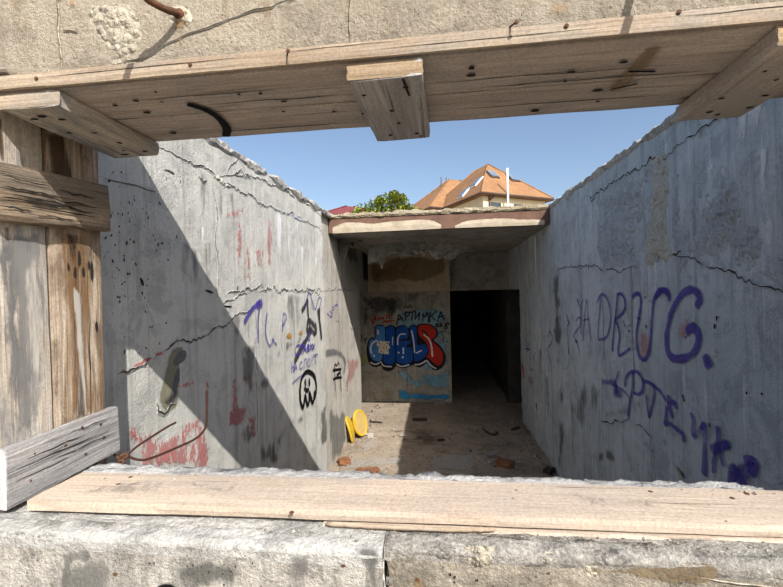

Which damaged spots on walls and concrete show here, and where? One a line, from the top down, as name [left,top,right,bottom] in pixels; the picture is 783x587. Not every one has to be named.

spalling [89,3,143,65]
spalling [144,0,194,27]
crack [115,0,296,65]
crack [104,178,155,192]
crack [589,118,727,203]
spalling [677,175,783,282]
crack [153,147,354,443]
crack [555,249,783,383]